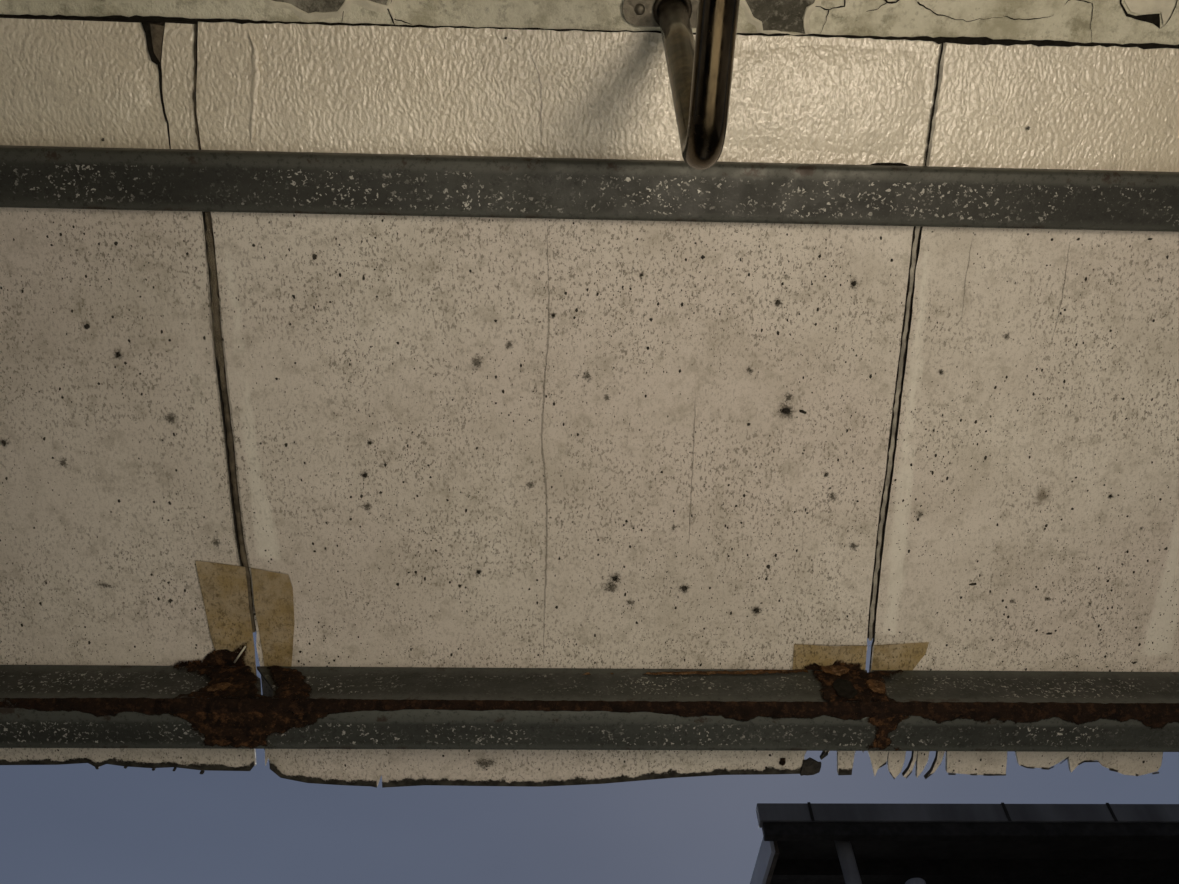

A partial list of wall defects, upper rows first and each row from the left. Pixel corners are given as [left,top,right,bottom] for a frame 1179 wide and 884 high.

peeling [264,0,395,20]
peeling [740,0,822,36]
peeling [1120,0,1175,28]
corrosion [0,643,1179,751]